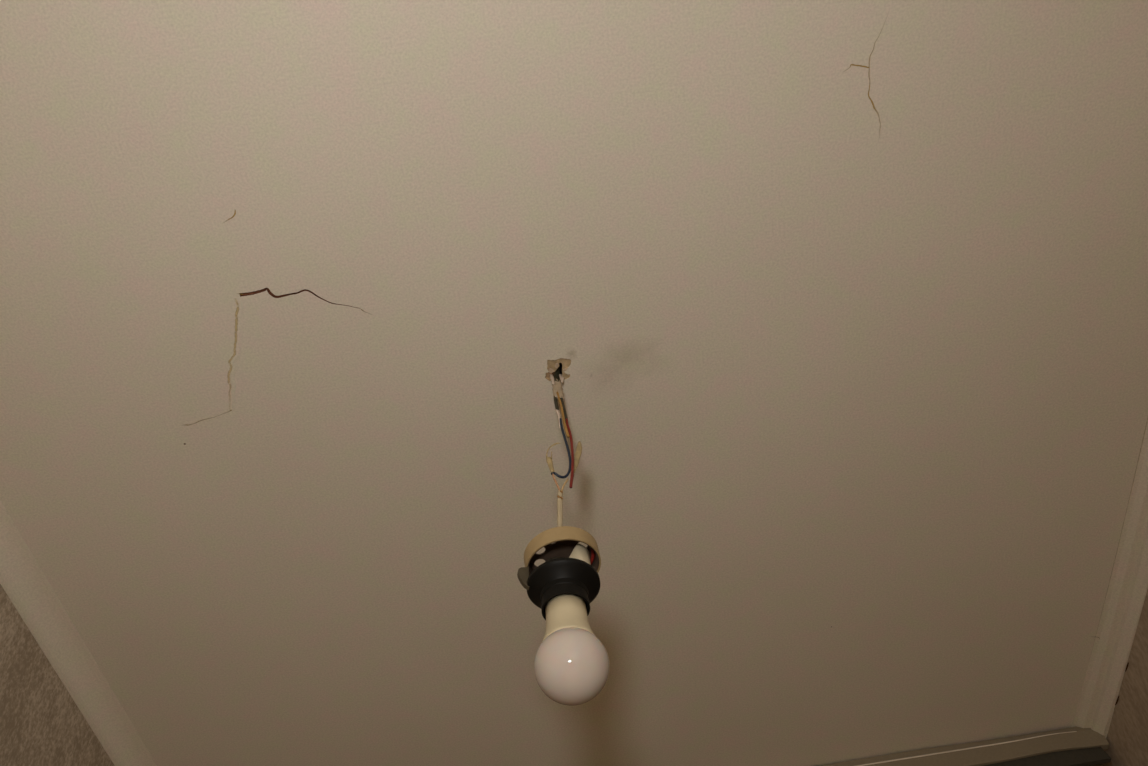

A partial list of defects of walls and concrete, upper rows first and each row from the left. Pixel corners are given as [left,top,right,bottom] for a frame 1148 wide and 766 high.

crack [850,55,876,110]
crack [239,288,363,311]